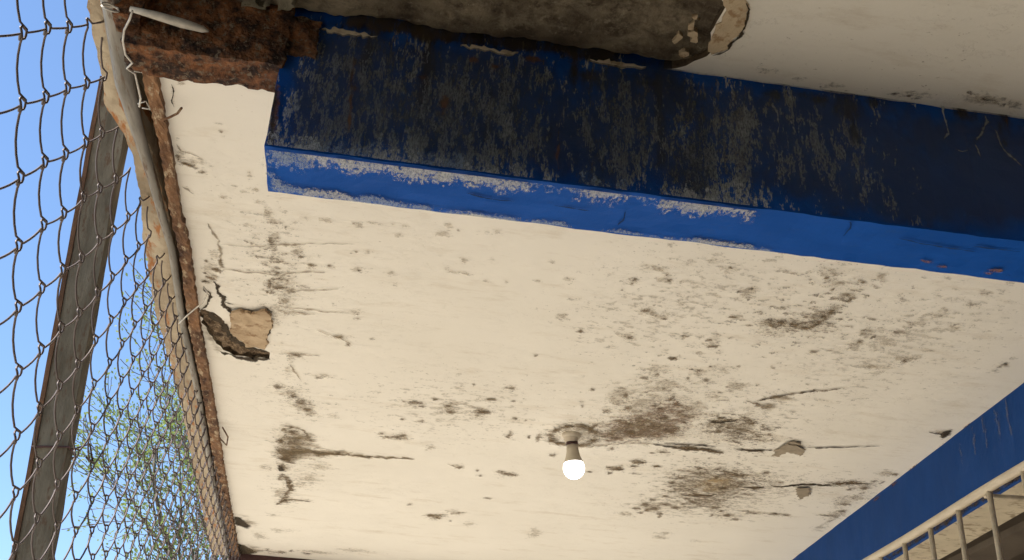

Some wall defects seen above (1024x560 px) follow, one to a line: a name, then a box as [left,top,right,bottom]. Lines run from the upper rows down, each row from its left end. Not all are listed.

corrosion [283,16,323,61]
spalling [237,0,750,70]
spalling [200,308,273,362]
crack [654,388,840,455]
damp [528,388,788,521]
peeling [772,441,806,457]
peeling [795,487,811,500]